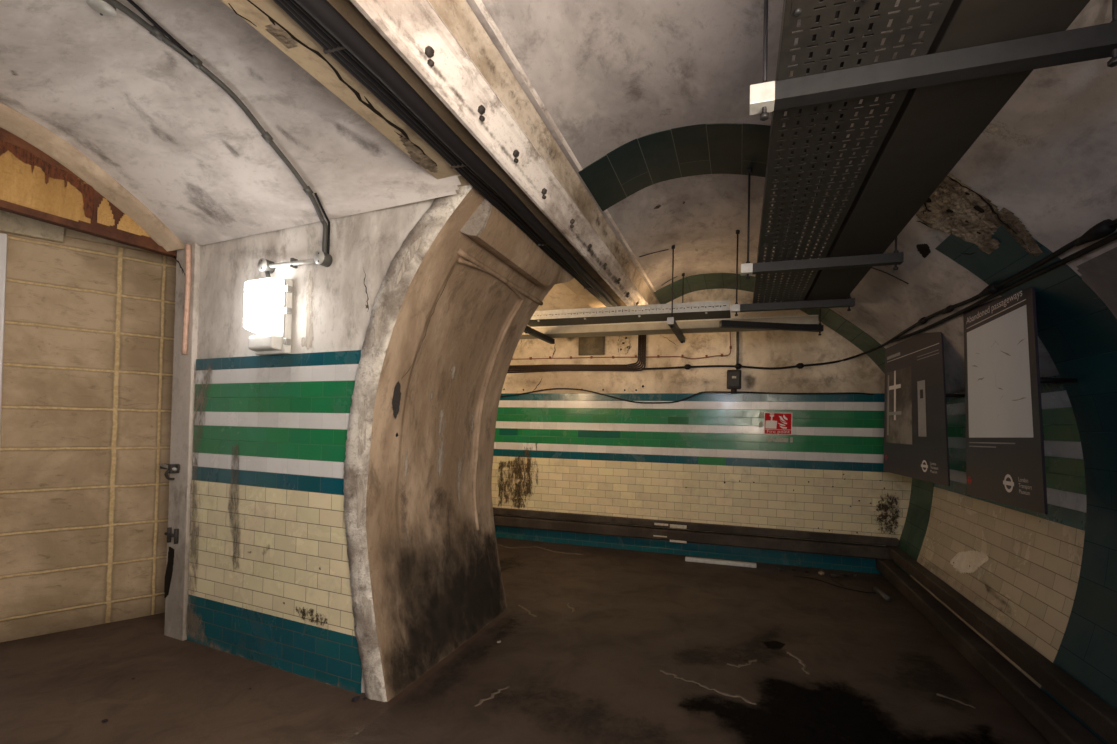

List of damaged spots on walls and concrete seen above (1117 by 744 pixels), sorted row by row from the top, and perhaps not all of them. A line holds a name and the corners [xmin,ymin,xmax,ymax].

spalling [916,173,1043,258]
water stain [228,445,239,568]
water stain [498,444,538,508]
water stain [877,493,899,534]
water stain [391,529,518,694]
water stain [680,678,1000,744]